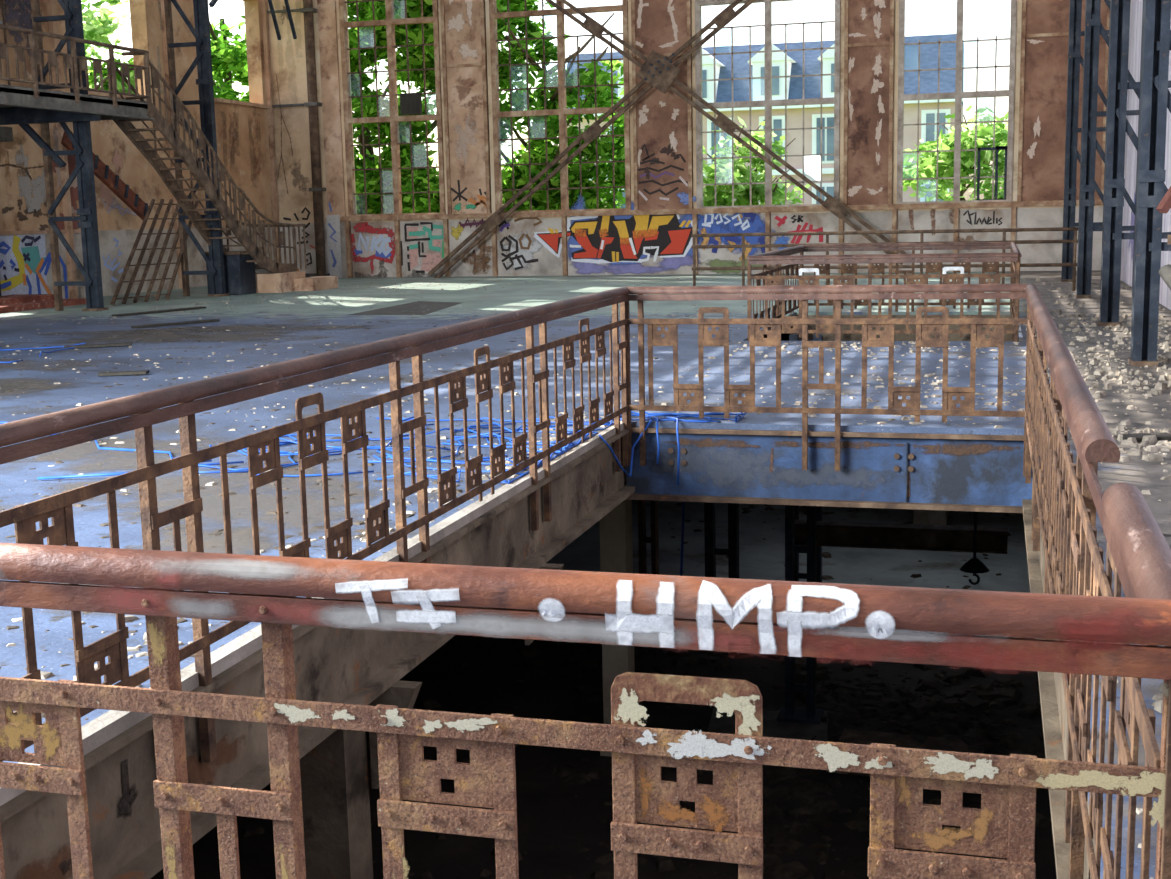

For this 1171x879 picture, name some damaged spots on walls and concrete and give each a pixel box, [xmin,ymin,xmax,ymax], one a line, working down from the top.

peeling [841,0,886,38]
peeling [871,53,885,165]
peeling [847,185,883,197]
rust [667,438,1020,472]
peeling [0,706,60,760]
peeling [614,688,772,760]
rust [187,735,239,784]
peeling [1035,769,1166,829]
rust [22,847,73,879]